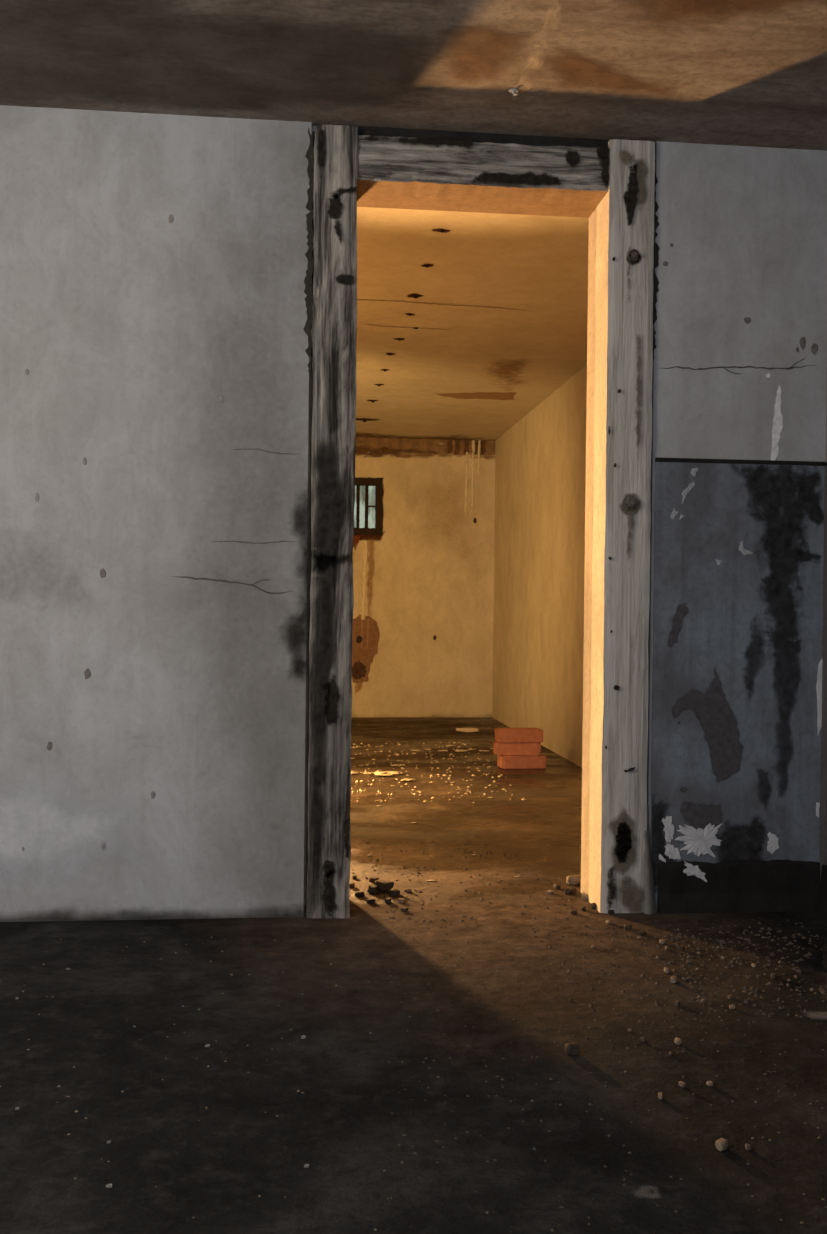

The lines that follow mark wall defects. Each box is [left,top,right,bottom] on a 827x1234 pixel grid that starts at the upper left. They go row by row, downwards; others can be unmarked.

crack [653,143,816,374]
crack [171,576,290,594]
crack [214,538,293,546]
rust [353,532,384,602]
leakage [741,373,824,804]
peeling [672,669,743,782]
spalling [659,787,722,882]
leakage [715,818,765,863]
spalling [767,832,780,854]